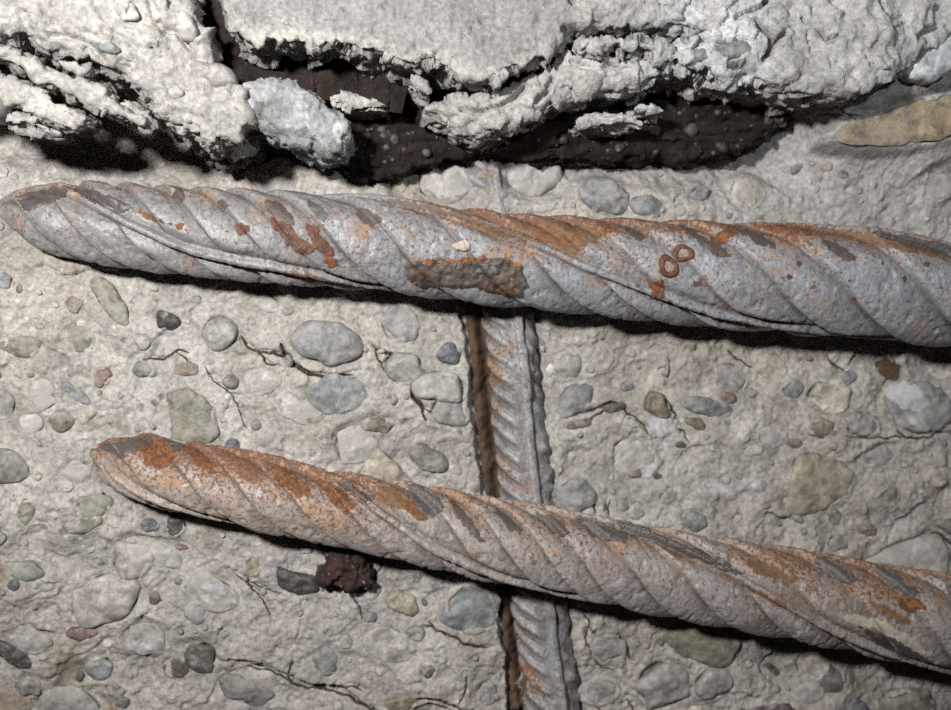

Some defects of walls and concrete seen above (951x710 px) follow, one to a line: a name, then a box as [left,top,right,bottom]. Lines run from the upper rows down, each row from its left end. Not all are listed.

spalling [0,45,159,145]
crack [826,106,860,120]
peeling [11,186,130,213]
corrosion [270,216,346,283]
corrosion [405,240,527,297]
corrosion [466,304,501,498]
corrosion [100,434,215,473]
peeling [406,482,484,542]
peeling [576,515,745,575]
corrosion [497,584,527,710]
peeling [858,626,929,662]
crack [247,661,370,710]